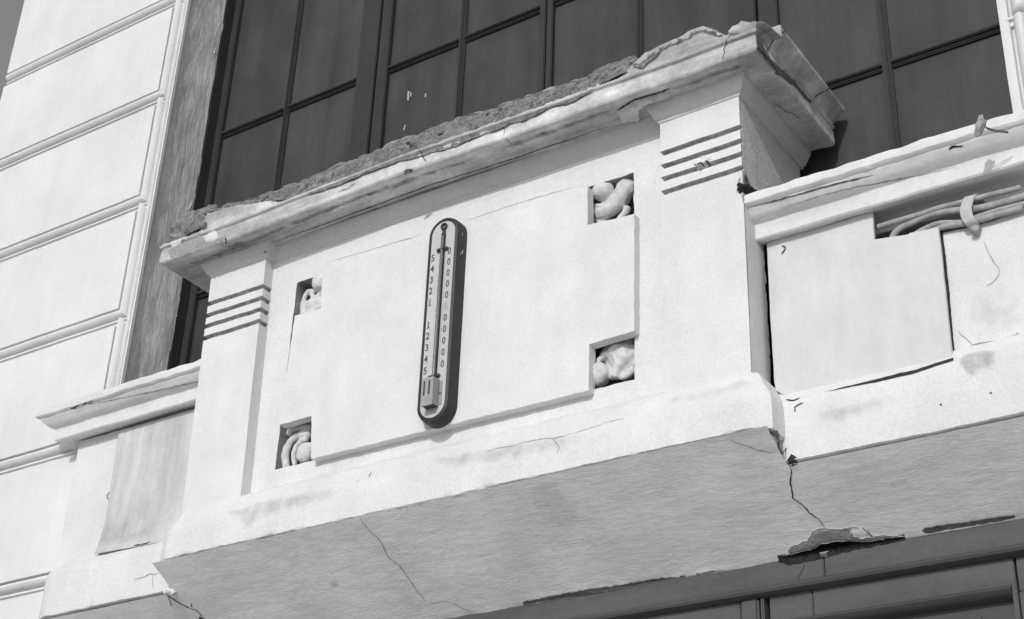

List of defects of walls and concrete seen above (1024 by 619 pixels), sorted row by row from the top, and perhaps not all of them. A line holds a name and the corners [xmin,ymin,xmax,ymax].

spalling [168,21,814,260]
crack [361,520,472,613]
crack [731,440,825,528]
flaking render [777,526,905,565]
peeling [922,515,1015,533]